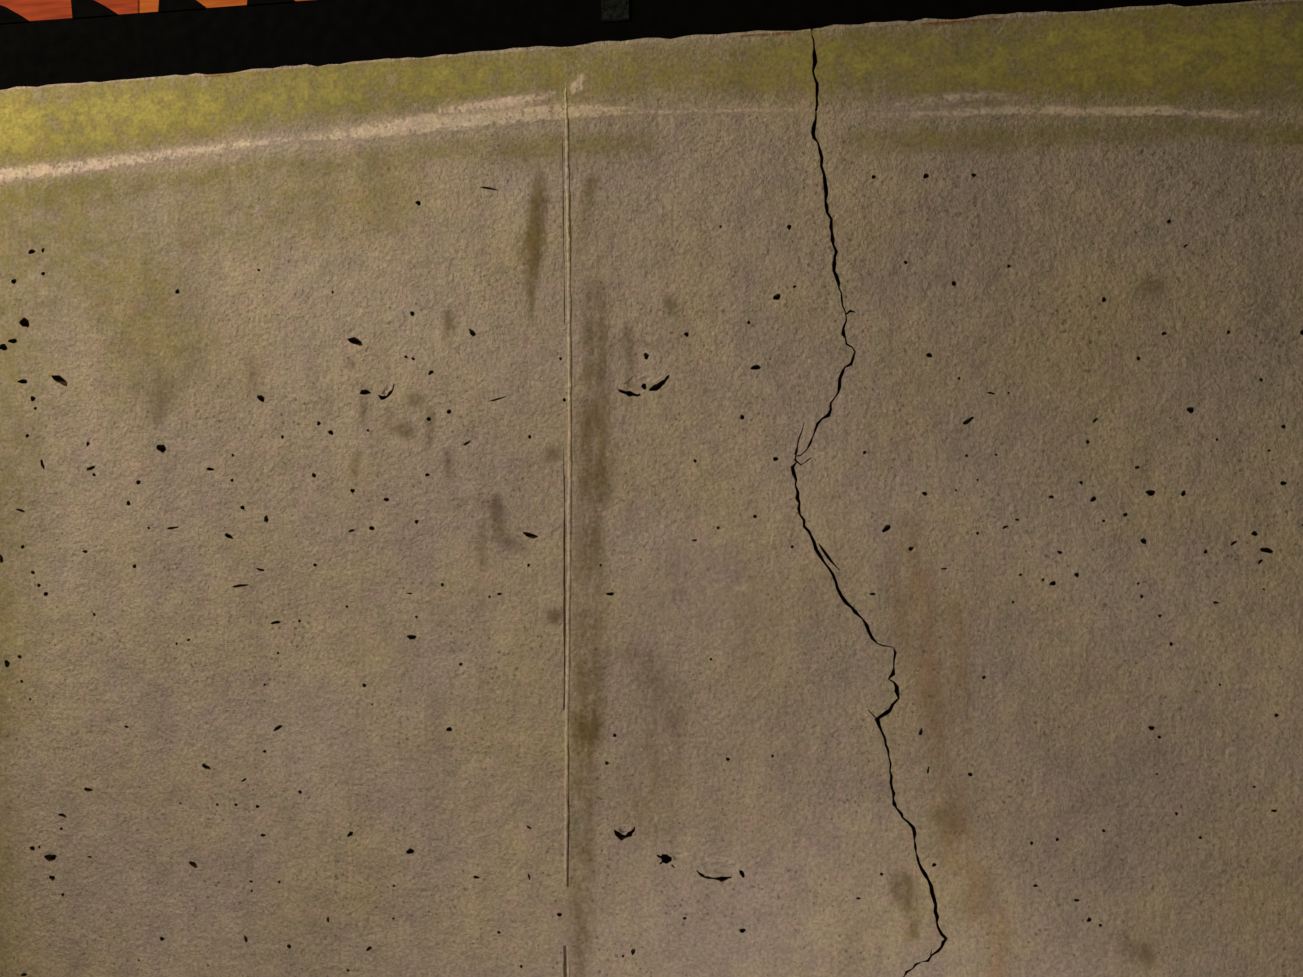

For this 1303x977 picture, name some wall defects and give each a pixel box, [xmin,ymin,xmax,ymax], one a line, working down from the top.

crack [791,26,948,977]